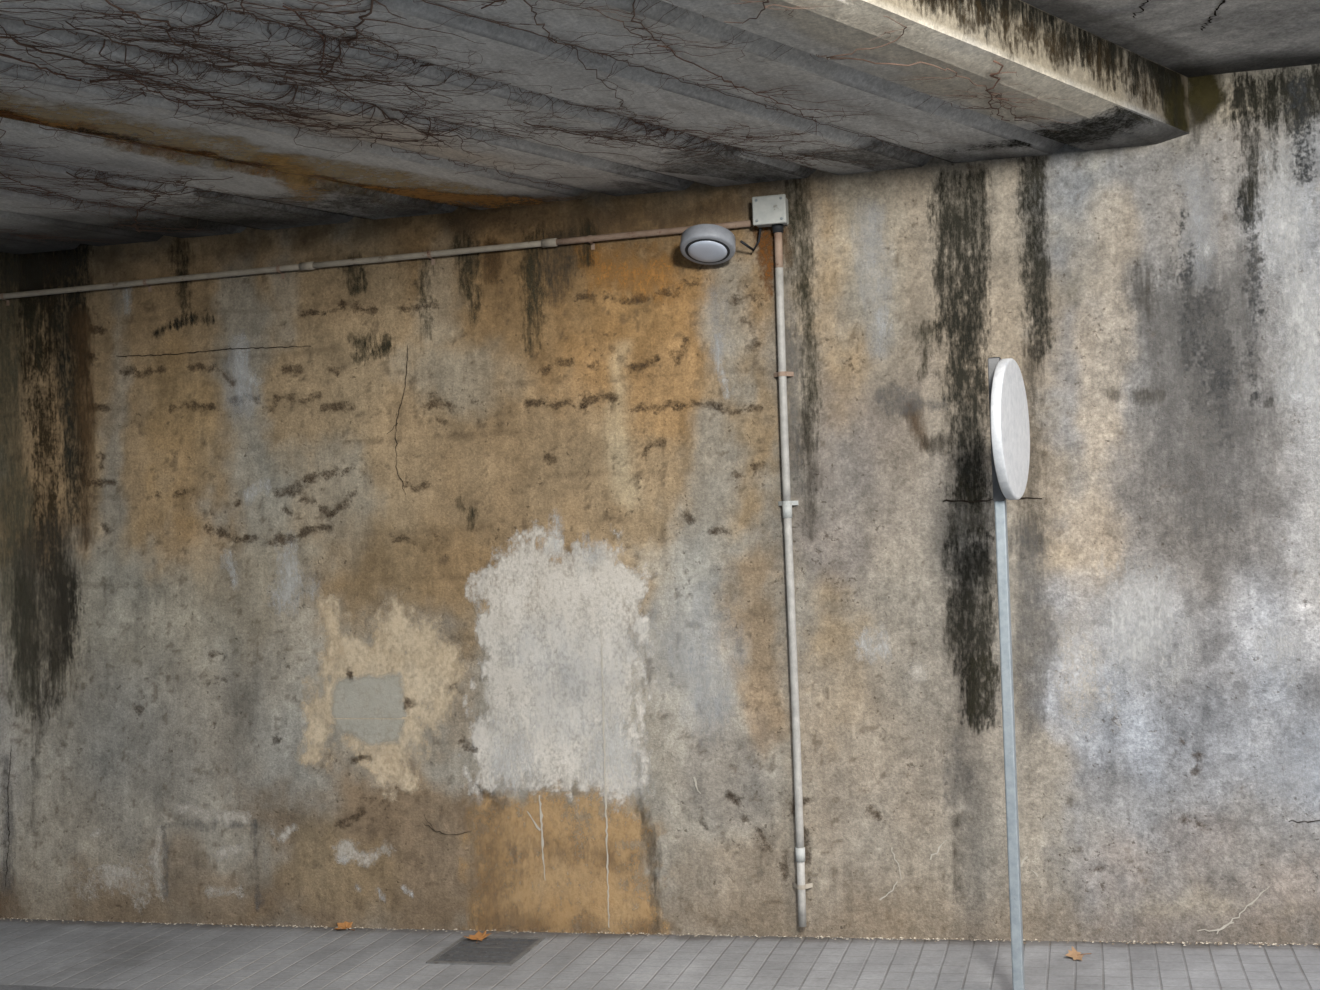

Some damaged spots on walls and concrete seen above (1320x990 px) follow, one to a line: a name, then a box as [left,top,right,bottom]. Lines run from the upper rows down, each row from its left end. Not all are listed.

damp [0,244,94,724]
damp [139,190,341,336]
damp [879,164,998,732]
damp [913,0,1181,391]
damp [1087,576,1172,664]
crack [1201,0,1225,30]
damp [1139,64,1320,531]